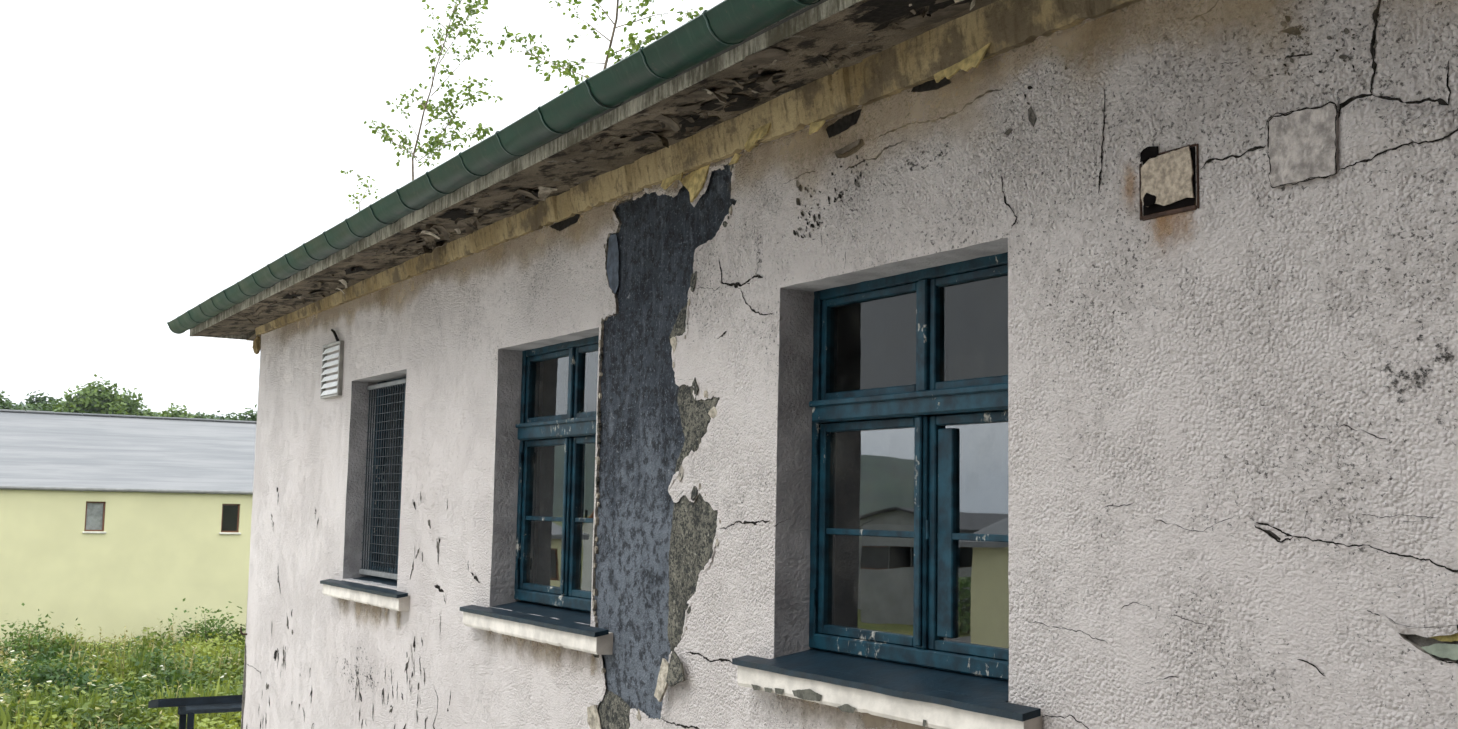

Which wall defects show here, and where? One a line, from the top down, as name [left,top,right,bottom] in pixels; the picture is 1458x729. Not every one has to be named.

peeling [911,43,991,92]
crack [1201,0,1458,188]
spalling [793,109,874,240]
crack [697,252,773,339]
peeling [587,122,771,729]
crack [720,520,786,535]
crack [1280,507,1458,572]
spalling [241,611,293,729]
peeling [333,637,428,729]
crack [660,719,699,729]
crack [687,651,736,667]
spalling [1377,613,1458,664]